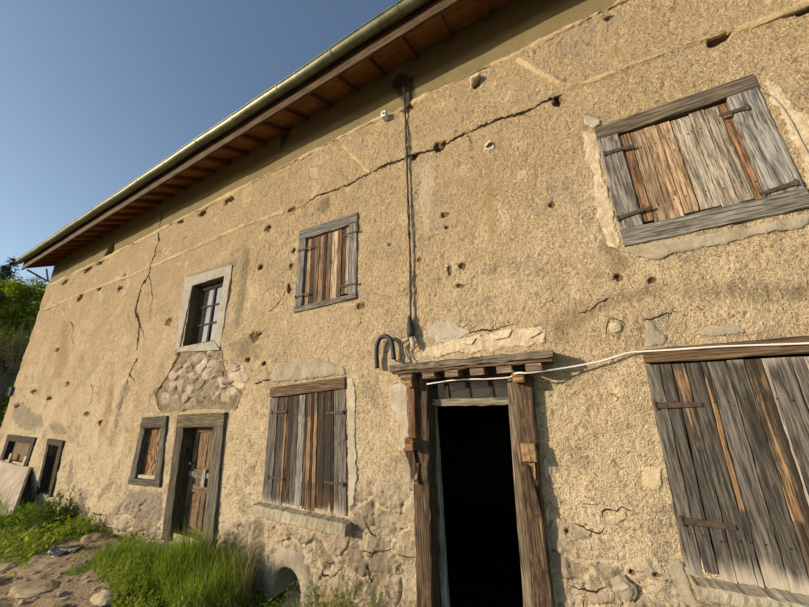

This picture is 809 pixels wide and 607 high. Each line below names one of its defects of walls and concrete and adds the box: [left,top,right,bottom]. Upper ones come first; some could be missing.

crack [299,93,563,208]
crack [115,213,163,429]
spalling [155,347,251,413]